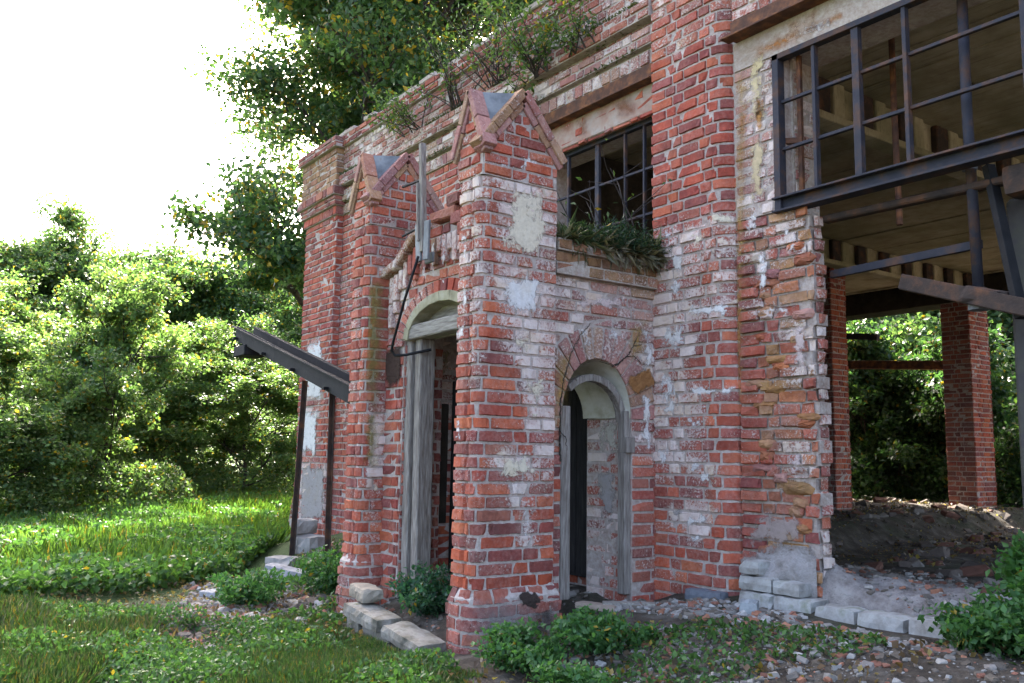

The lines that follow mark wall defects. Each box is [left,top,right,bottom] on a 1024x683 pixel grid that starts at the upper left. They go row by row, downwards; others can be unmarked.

rust [760,15,841,54]
peeling [503,191,546,252]
spalling [785,230,817,267]
peeling [504,276,542,314]
spalling [689,255,815,411]
crack [559,323,642,462]
spalling [796,413,821,429]
spalling [750,439,815,554]